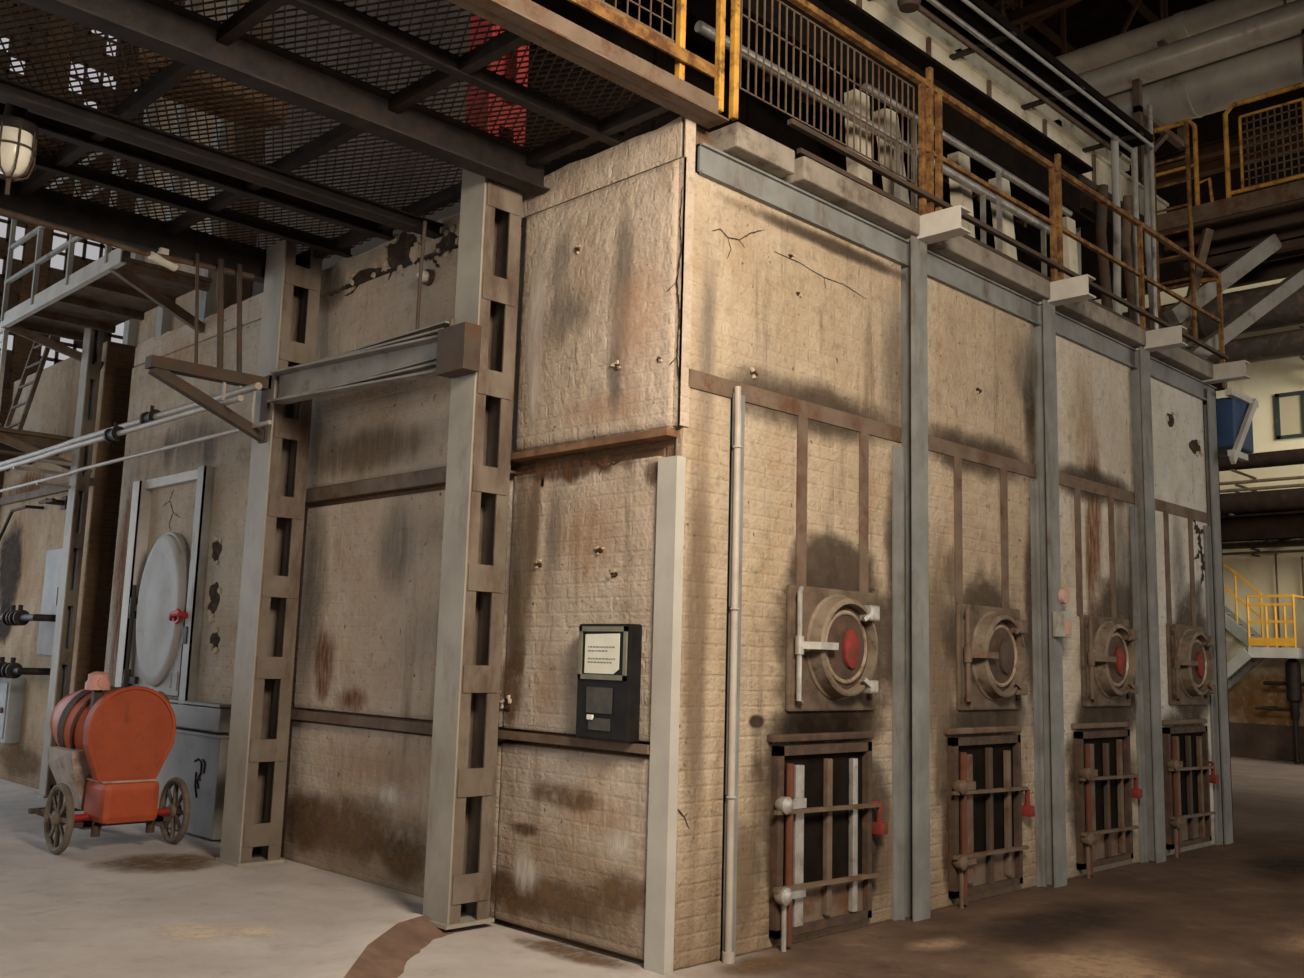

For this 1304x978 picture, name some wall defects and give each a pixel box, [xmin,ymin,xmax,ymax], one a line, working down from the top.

spalling [350,224,459,286]
crack [585,160,683,417]
crack [712,228,866,299]
spalling [212,534,222,565]
rust [1086,497,1100,601]
spalling [203,582,222,654]
rust [316,640,332,696]
damp [284,786,422,880]
damp [537,786,592,809]
damp [491,855,642,922]